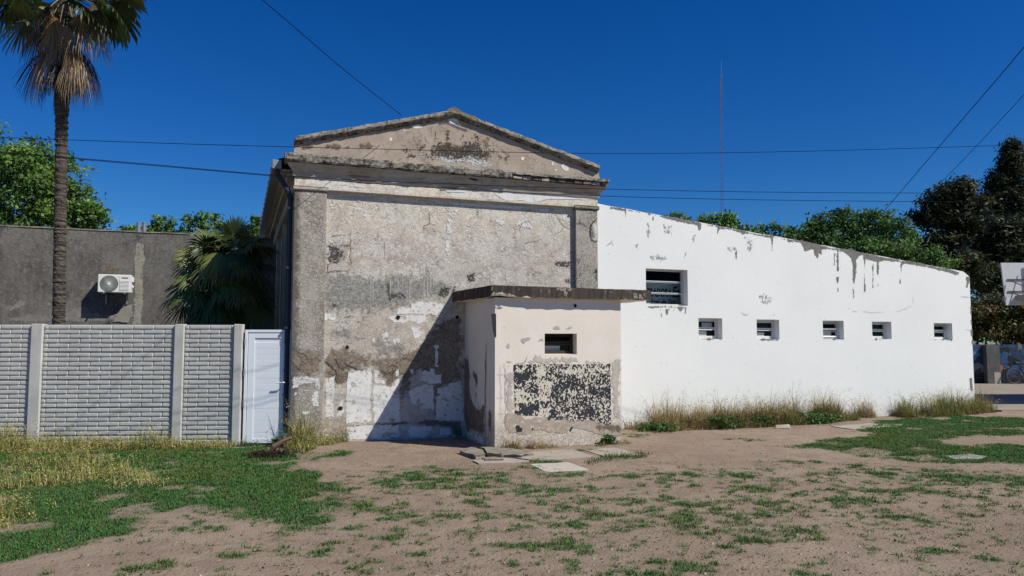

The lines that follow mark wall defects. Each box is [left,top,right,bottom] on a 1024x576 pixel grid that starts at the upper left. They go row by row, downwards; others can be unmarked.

leakage [325,243,456,317]
peeling [372,301,443,352]
peeling [292,345,484,444]
peeling [505,330,622,432]